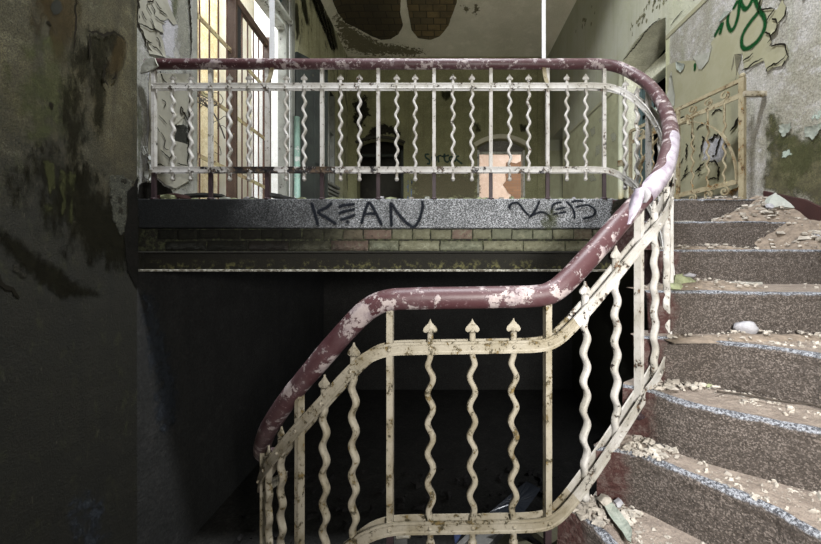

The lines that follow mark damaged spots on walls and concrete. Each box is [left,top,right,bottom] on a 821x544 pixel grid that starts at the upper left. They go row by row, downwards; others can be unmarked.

flaking render [333,0,480,57]
peeling [630,0,667,35]
water stain [7,0,126,270]
peeling [109,0,189,288]
peeling [642,0,789,204]
peeling [779,122,792,137]
peeling [804,110,821,140]
water stain [0,231,97,299]